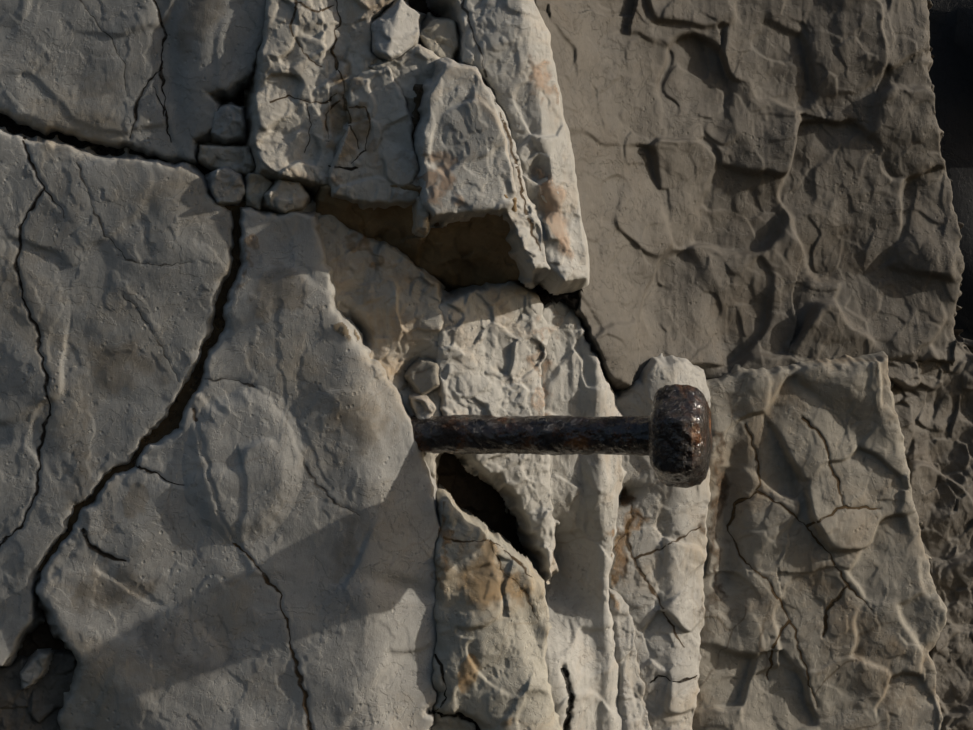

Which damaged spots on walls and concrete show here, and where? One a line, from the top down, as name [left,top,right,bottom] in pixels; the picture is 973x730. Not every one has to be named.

crack [0,0,211,546]
spalling [535,169,572,257]
crack [38,201,255,572]
crack [303,461,360,516]
crack [233,543,313,730]
crack [560,668,575,730]
crack [611,506,700,648]
crack [650,675,697,683]